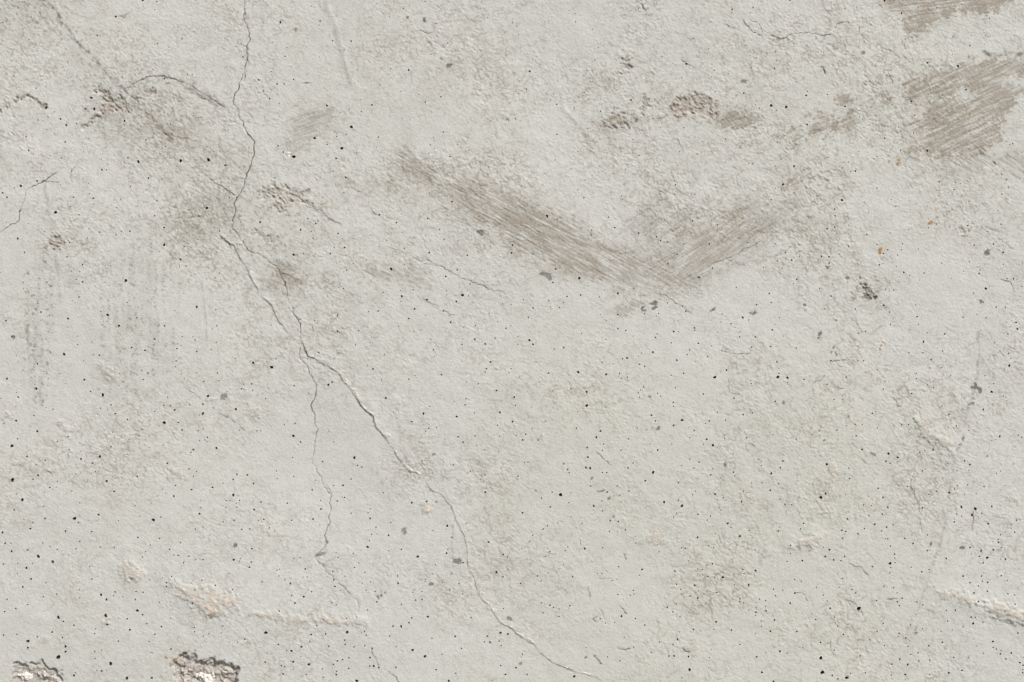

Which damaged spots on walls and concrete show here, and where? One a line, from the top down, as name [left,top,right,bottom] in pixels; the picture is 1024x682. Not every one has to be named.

crack [205,12,255,252]
crack [267,264,420,475]
spalling [12,660,63,682]
spalling [170,650,240,682]